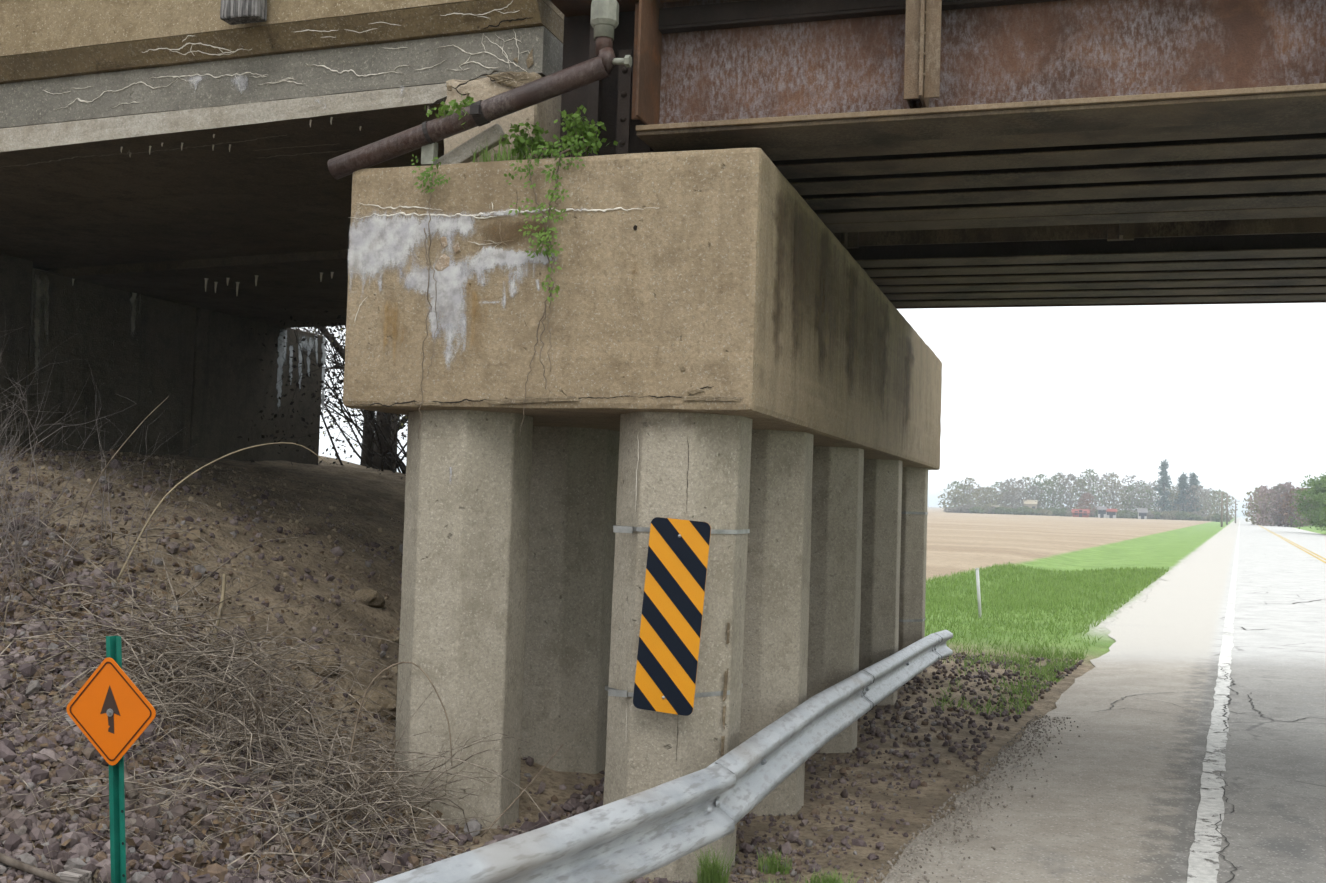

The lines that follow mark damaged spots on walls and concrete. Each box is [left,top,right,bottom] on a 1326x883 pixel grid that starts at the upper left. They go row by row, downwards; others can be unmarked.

crack [44,0,533,110]
crack [348,192,653,248]
leakage [320,209,556,364]